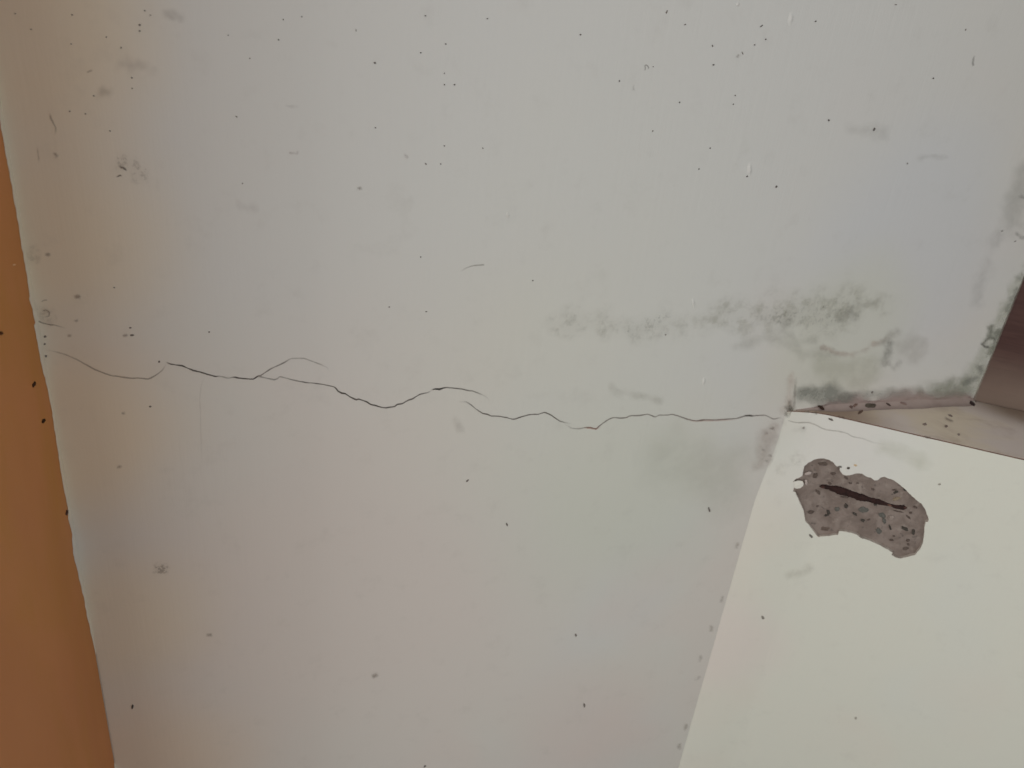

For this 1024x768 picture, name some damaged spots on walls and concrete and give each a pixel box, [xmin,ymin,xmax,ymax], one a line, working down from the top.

crack [168,362,559,421]
spalling [793,458,929,558]